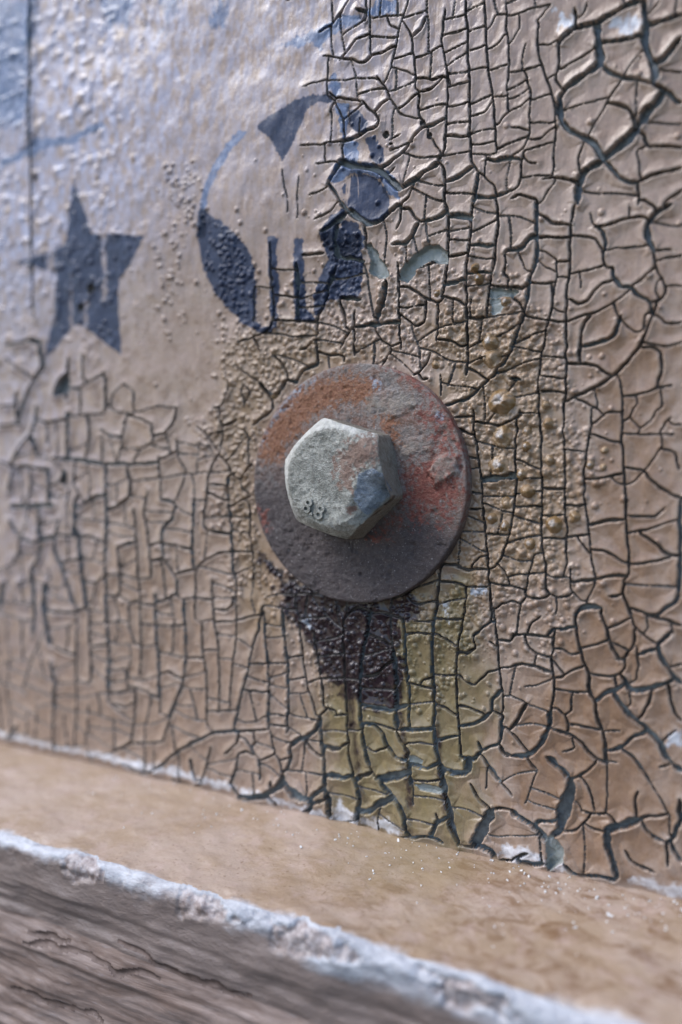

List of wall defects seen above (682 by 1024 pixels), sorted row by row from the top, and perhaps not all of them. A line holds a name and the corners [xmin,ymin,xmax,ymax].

crack [26,0,35,316]
peeling [367,244,450,283]
crack [0,338,46,427]
crack [0,355,256,751]
rust [255,498,276,540]
rust [255,363,423,519]
crack [52,0,682,882]